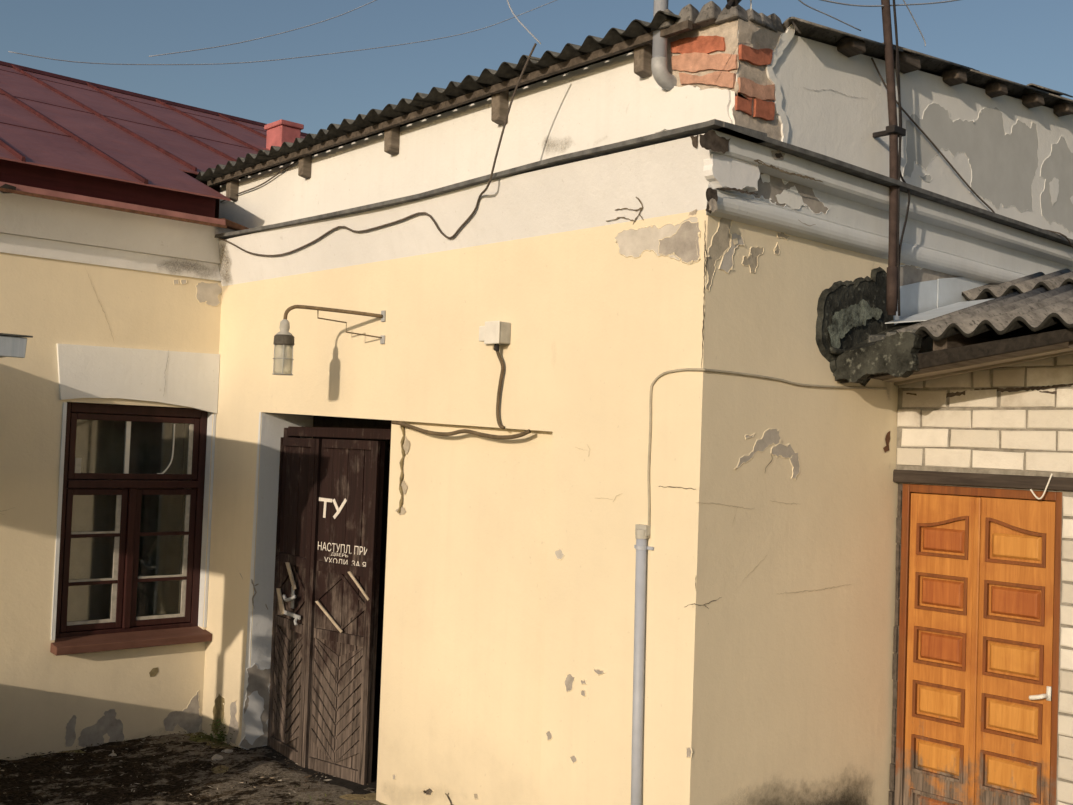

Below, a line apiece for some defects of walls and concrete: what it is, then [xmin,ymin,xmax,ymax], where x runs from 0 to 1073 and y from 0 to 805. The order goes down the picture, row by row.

flaking render [650,18,795,160]
peeling [748,173,829,215]
peeling [902,102,1073,233]
peeling [614,188,789,292]
peeling [734,428,800,480]
flaking render [64,708,125,748]
flaking render [163,663,271,750]
damp [761,786,866,805]